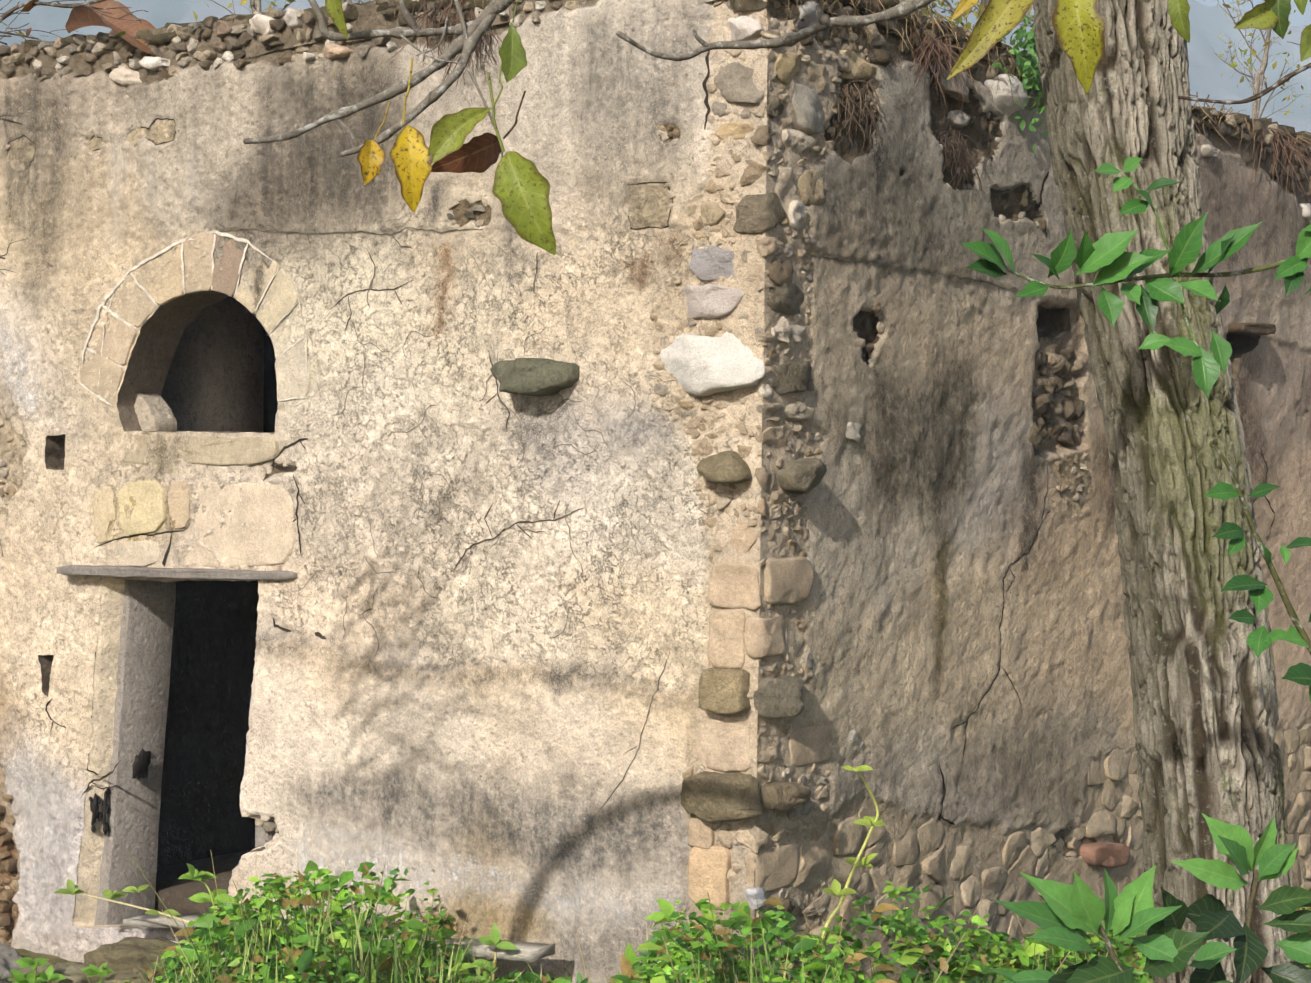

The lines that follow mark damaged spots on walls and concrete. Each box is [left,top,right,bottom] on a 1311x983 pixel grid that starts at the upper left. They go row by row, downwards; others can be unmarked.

leakage [4,89,60,265]
leakage [216,78,403,221]
crack [702,51,710,129]
spalling [930,76,1003,191]
spalling [990,185,1047,232]
crack [219,227,486,416]
spalling [853,302,885,365]
spalling [0,413,27,502]
leakage [863,363,976,554]
crack [262,438,449,657]
crack [454,501,583,578]
leakage [297,780,675,971]